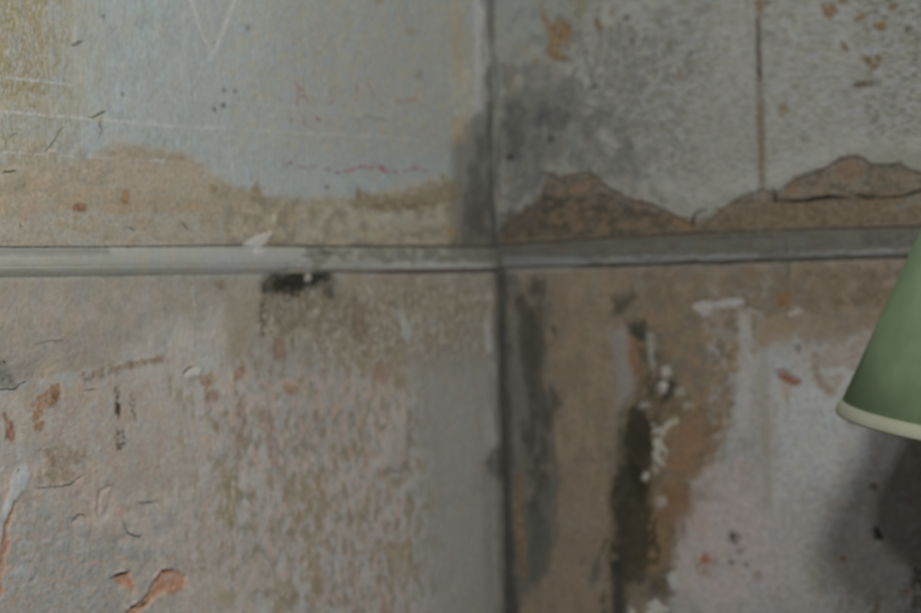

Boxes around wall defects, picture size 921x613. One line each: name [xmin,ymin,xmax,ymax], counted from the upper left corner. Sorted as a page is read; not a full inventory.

peeling [818,0,900,33]
peeling [838,38,885,90]
flaking render [497,150,921,244]
water stain [254,237,375,364]
crack [0,380,30,390]
water stain [482,269,567,613]
water stain [593,259,906,613]
flaking render [109,565,188,613]